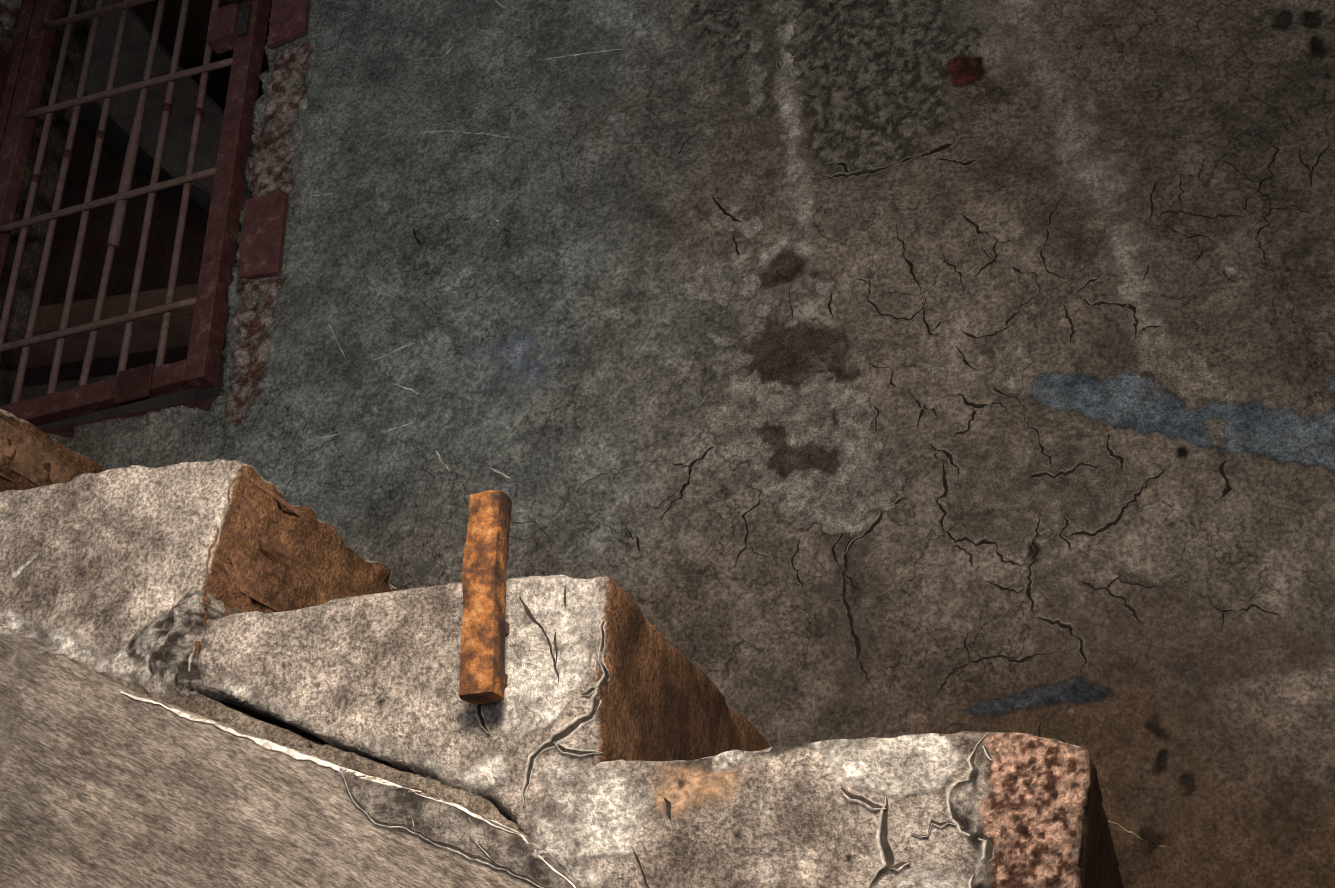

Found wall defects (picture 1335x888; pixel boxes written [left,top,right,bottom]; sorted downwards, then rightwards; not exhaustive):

spalling [247,38,320,198]
crack [1150,128,1335,283]
spalling [225,275,287,425]
crack [625,446,713,552]
crack [730,490,804,593]
crack [828,200,1169,695]
crack [1080,573,1286,630]
crack [519,585,610,806]
peeling [967,677,1111,716]
peeling [544,761,651,858]
spalling [674,732,1092,888]
crack [840,734,994,888]